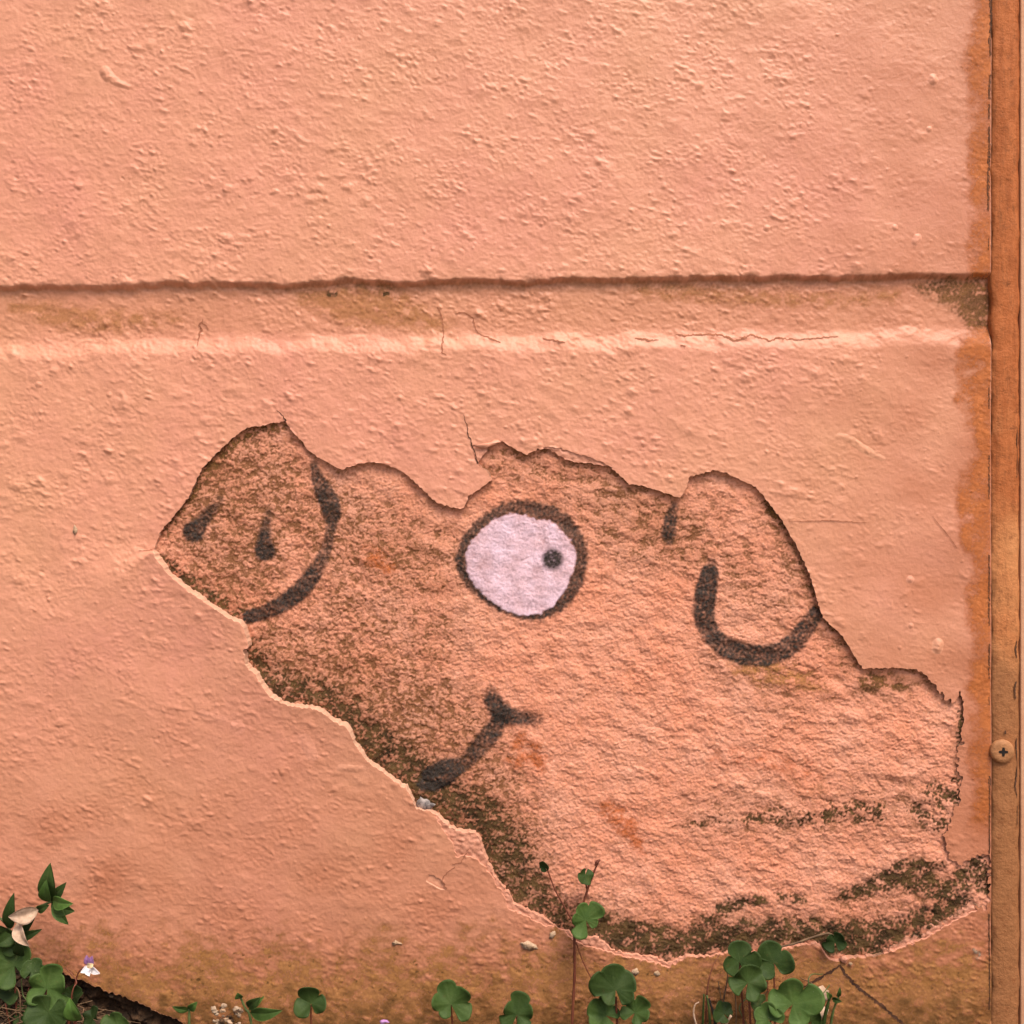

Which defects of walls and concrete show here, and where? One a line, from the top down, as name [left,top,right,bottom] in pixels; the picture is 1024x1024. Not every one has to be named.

damp [918,279,989,329]
crack [636,333,838,347]
peeling [153,421,991,976]